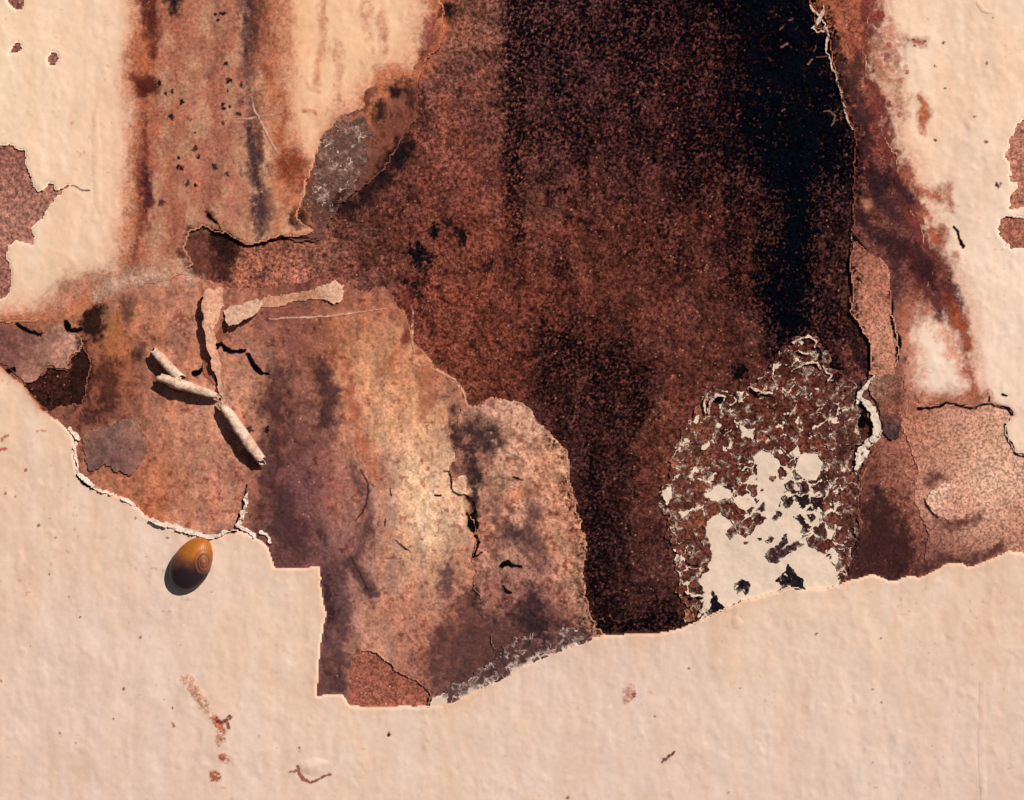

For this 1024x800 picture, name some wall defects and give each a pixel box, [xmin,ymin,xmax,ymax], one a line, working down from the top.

rust [333,0,449,123]
crack [207,213,316,247]
rust [856,0,989,412]
peeling [0,0,796,708]
rust [401,293,416,344]
peeling [659,0,1024,623]
crack [917,393,1024,457]
crack [434,470,483,558]
rust [183,675,232,781]